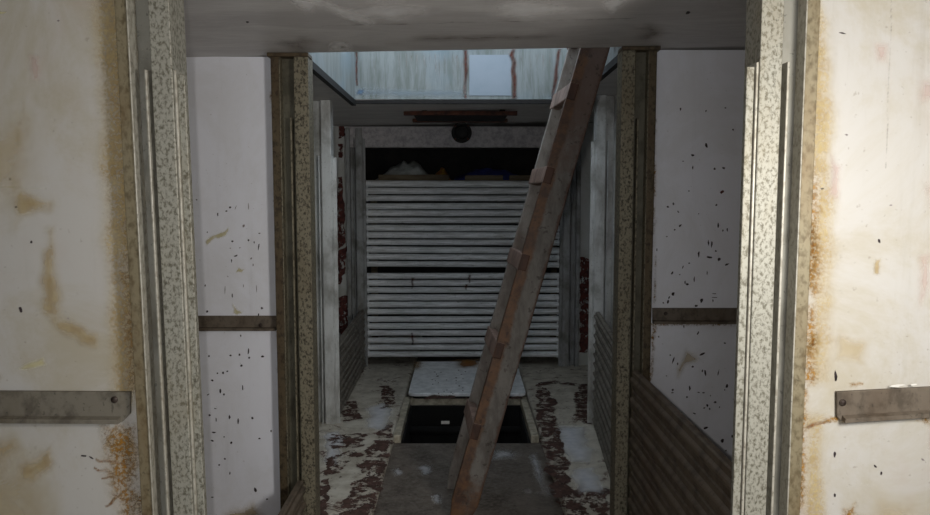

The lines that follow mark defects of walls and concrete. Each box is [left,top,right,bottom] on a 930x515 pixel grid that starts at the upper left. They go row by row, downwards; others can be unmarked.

rust [100,0,135,391]
rust [809,22,832,294]
water stain [44,249,95,344]
rust [94,429,142,515]
peeling [320,370,467,515]
peeling [497,383,610,515]
rust [800,302,838,515]